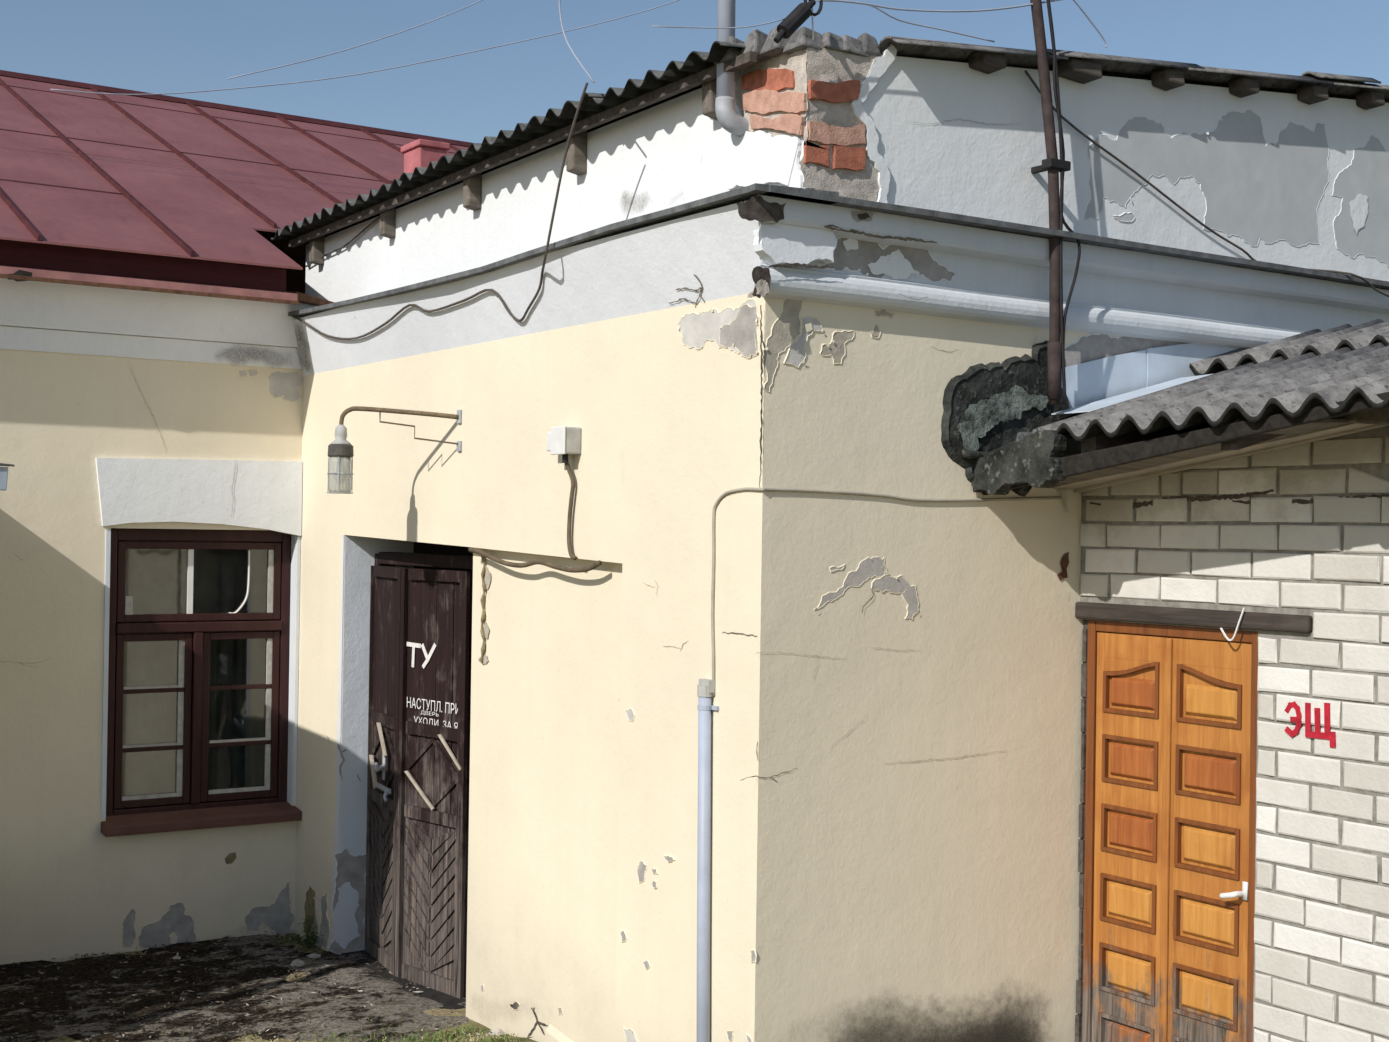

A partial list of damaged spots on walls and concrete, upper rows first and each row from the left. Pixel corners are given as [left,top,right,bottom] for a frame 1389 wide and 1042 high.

spalling [723,44,897,223]
peeling [1083,109,1389,268]
peeling [824,238,956,283]
peeling [677,266,895,393]
peeling [814,556,919,620]
peeling [121,902,197,949]
peeling [244,848,366,955]
water stain [844,1006,1037,1042]